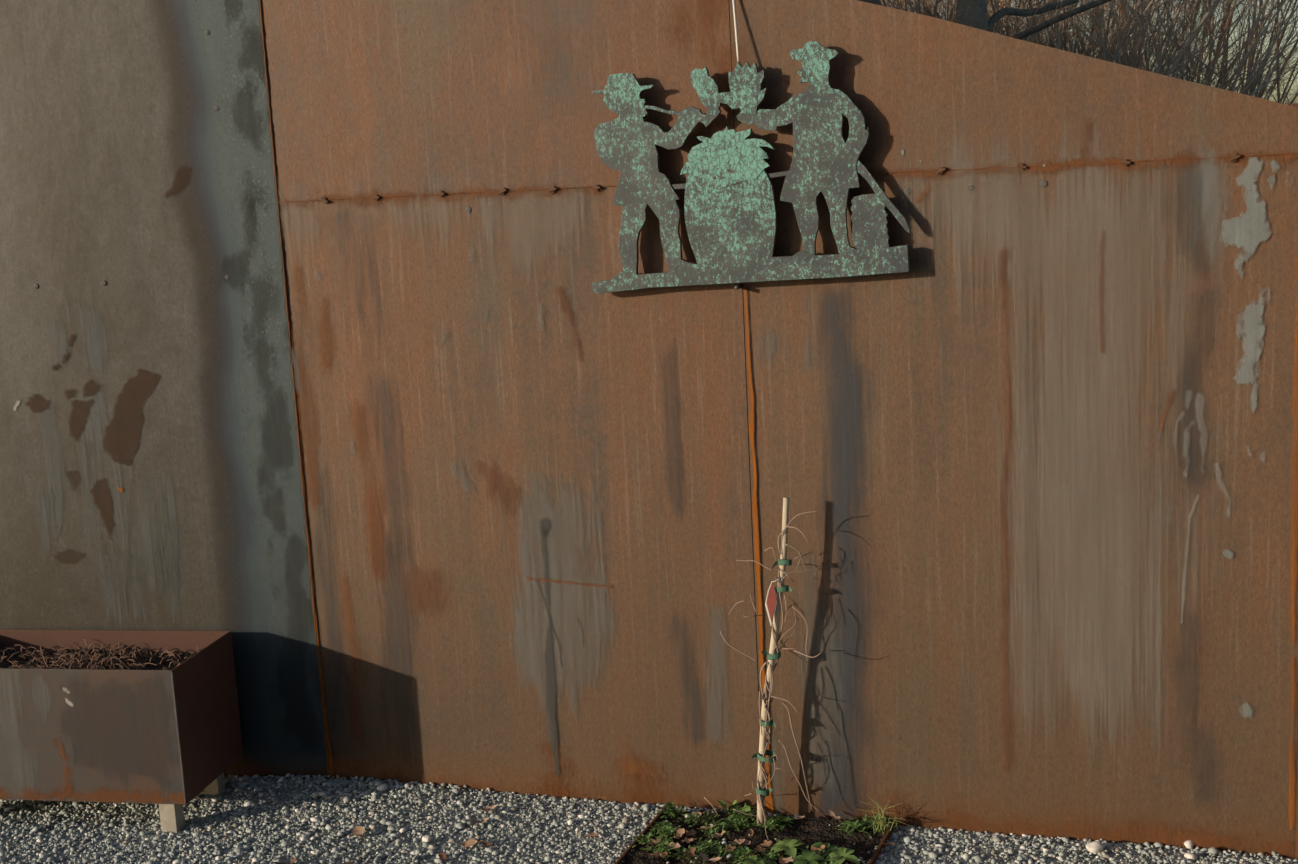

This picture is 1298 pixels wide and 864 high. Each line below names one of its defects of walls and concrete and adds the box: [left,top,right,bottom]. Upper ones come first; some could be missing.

rust [165,167,191,197]
peeling [1222,158,1280,273]
peeling [1234,295,1265,412]
rust [26,394,50,412]
rust [65,380,98,441]
rust [103,369,160,465]
rust [91,479,123,534]
rust [744,285,766,700]
damp [516,497,612,774]
rust [764,726,774,815]
rust [1082,825,1237,850]